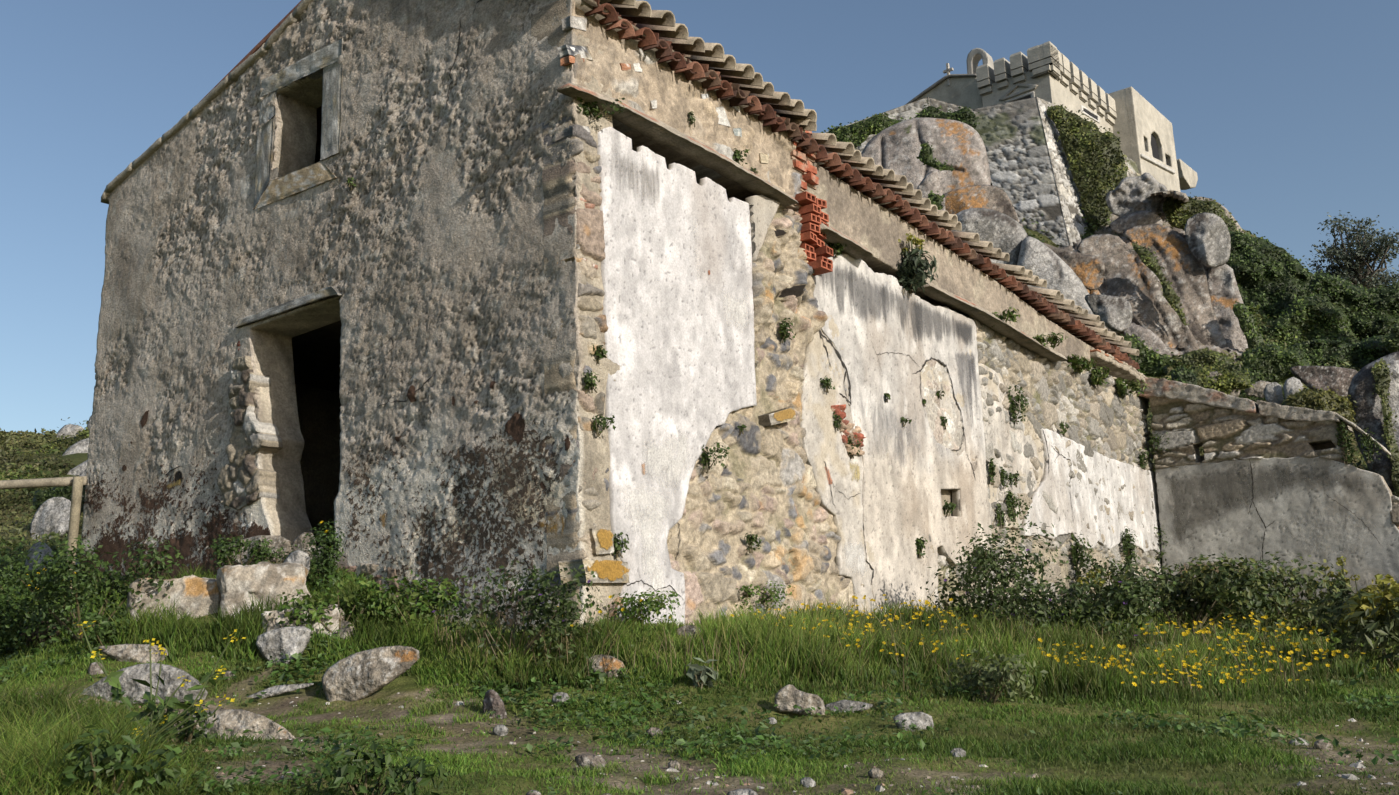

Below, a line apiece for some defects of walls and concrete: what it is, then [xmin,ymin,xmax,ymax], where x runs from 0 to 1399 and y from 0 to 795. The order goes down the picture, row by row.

crack [446,0,481,109]
peeling [79,334,283,595]
peeling [340,411,575,632]
spalling [667,205,866,625]
leakage [822,268,974,416]